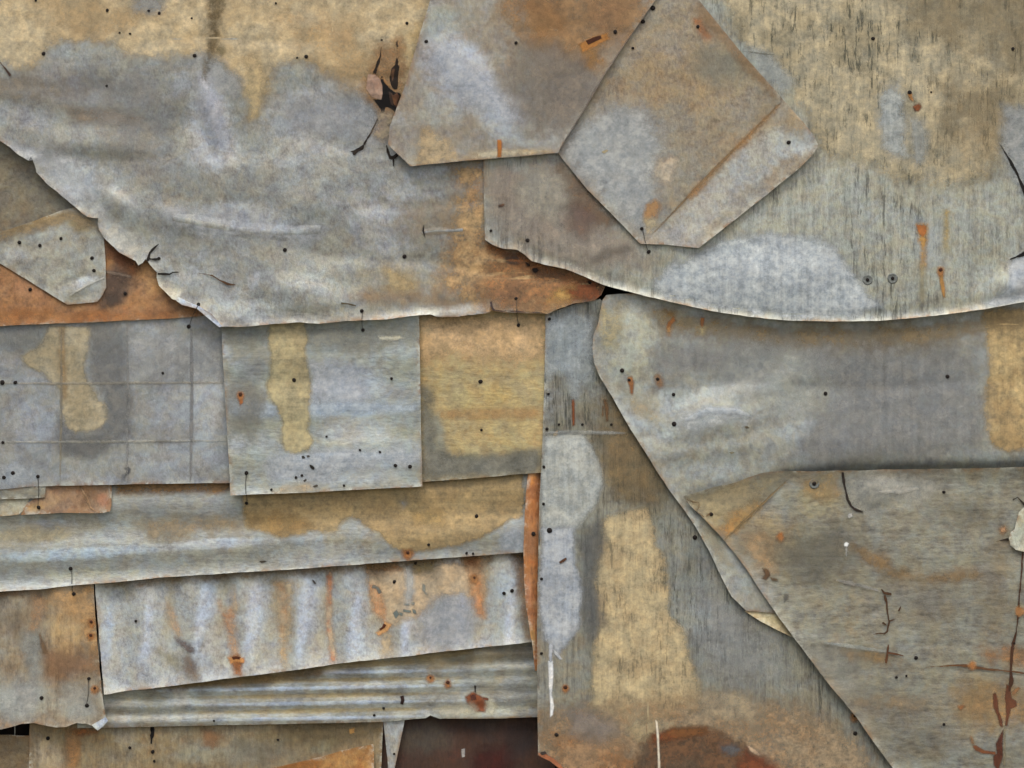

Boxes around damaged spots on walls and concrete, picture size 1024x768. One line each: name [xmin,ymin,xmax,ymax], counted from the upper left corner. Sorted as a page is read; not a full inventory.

rust [501,0,653,69]
rust [109,246,139,274]
damp [0,326,221,455]
damp [145,322,771,722]
crack [842,472,863,512]
peeling [1009,508,1024,552]
rust [173,600,321,689]
rust [202,550,493,661]
crack [873,589,903,663]
rust [465,692,495,714]
rust [538,694,869,768]
rust [970,685,1020,768]